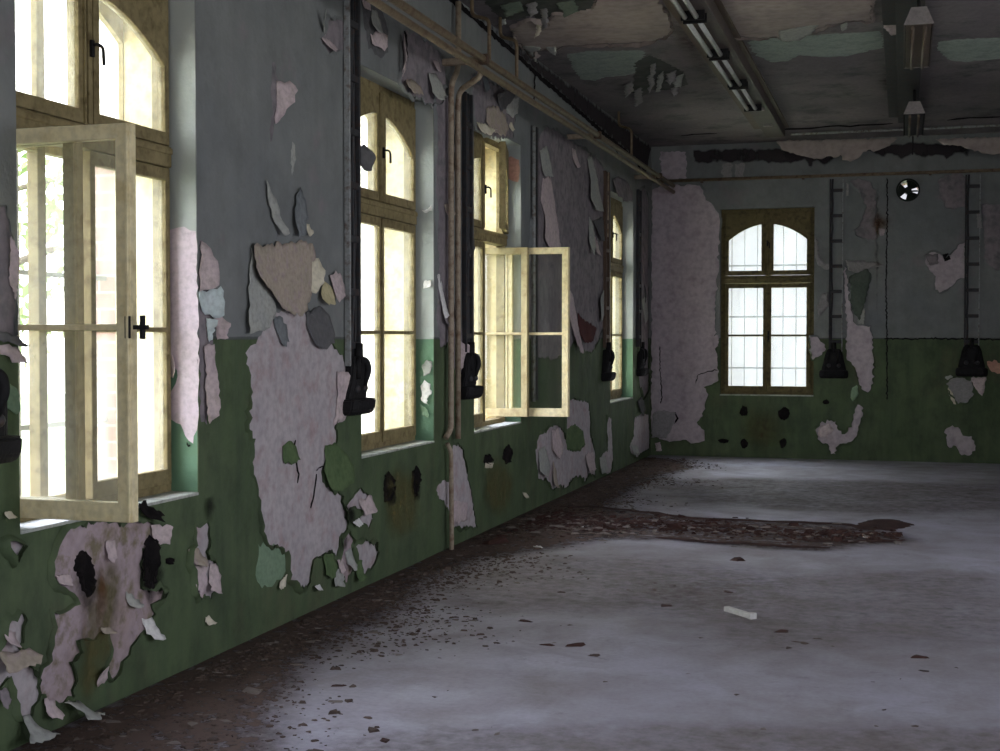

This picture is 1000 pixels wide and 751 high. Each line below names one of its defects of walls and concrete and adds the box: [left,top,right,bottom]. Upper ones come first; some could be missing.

peeling [484,0,688,107]
peeling [0,205,29,364]
peeling [170,227,231,447]
spalling [242,180,380,595]
peeling [420,360,432,418]
spalling [397,27,470,379]
spalling [529,125,608,363]
spalling [535,397,614,491]
spalling [629,151,722,459]
spalling [813,264,876,455]
spalling [0,500,173,744]
peeling [185,519,223,626]